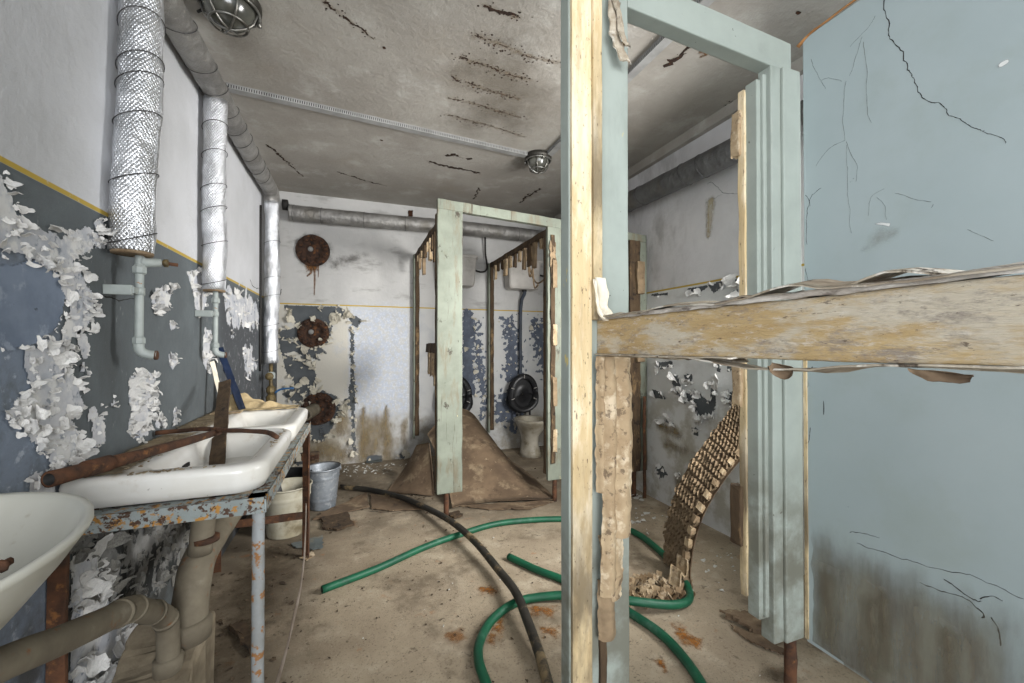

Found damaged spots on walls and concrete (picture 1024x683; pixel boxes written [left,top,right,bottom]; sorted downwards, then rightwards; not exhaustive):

crack [323,0,375,39]
crack [428,153,481,199]
crack [440,2,561,135]
crack [811,0,1006,229]
peeling [0,170,183,492]
peeling [150,267,259,381]
peeling [278,304,410,477]
water stain [310,406,406,461]
peeling [462,309,544,434]
peeling [68,522,191,620]
water stain [816,551,1000,683]
crack [850,531,1023,646]